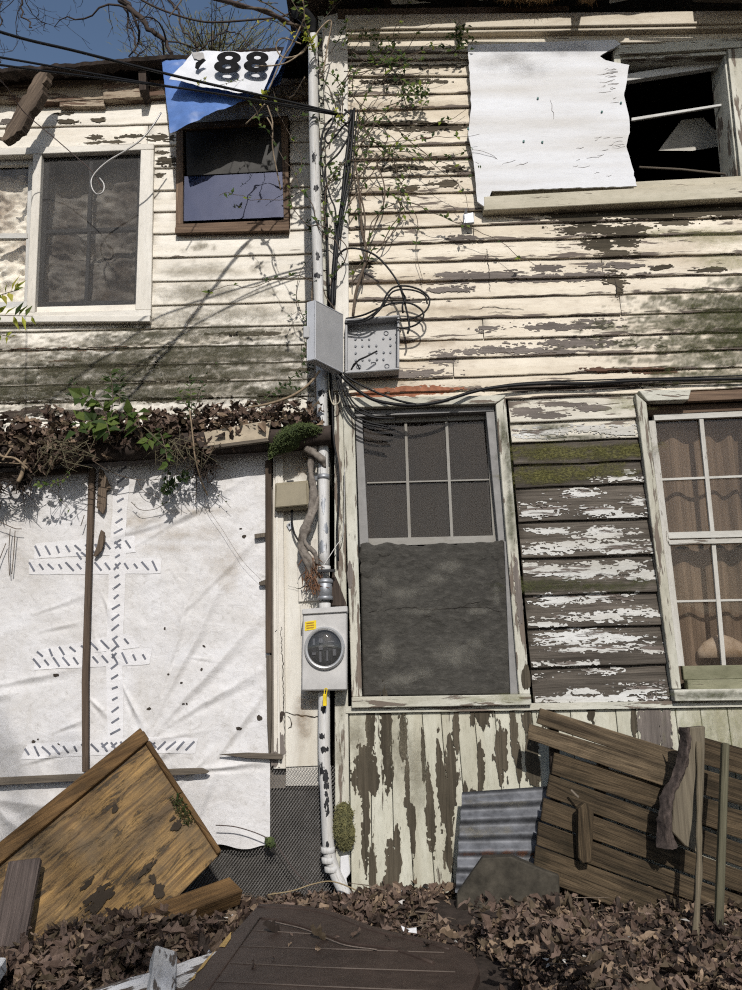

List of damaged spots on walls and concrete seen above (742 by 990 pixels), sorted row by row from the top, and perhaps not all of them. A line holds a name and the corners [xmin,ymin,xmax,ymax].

peeling [349,63,469,85]
peeling [53,112,176,178]
peeling [348,120,468,139]
peeling [364,163,465,191]
peeling [364,203,742,305]
leakage [0,314,314,405]
leakage [507,425,641,485]
peeling [350,469,673,904]